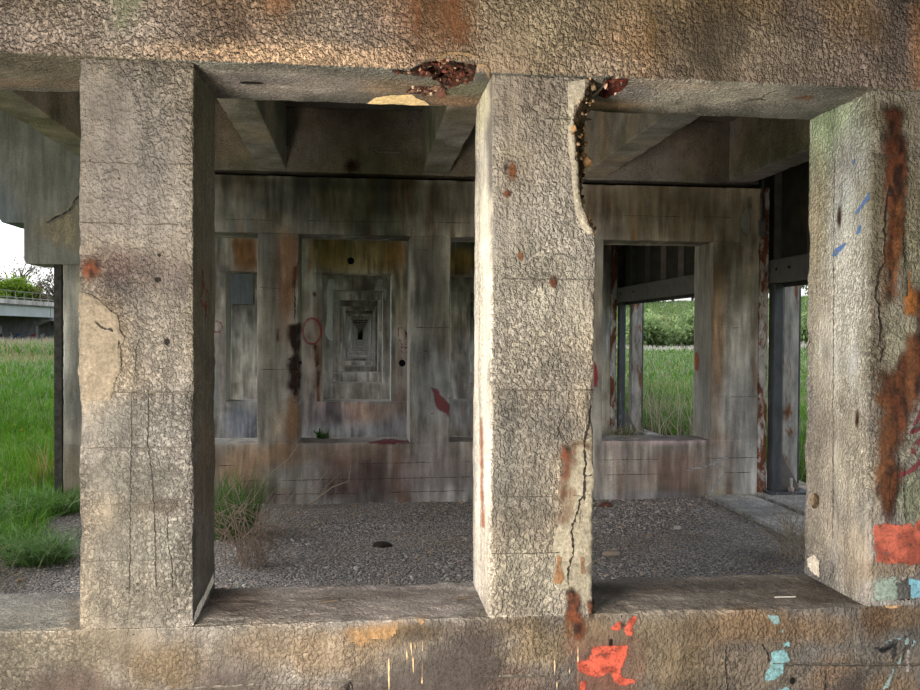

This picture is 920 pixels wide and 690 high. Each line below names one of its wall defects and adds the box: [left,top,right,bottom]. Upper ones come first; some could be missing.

spalling [368,51,490,106]
spalling [567,76,628,235]
crack [873,182,905,362]
rust [877,106,920,522]
crack [557,391,593,588]
rust [566,588,594,639]
crack [722,644,730,690]